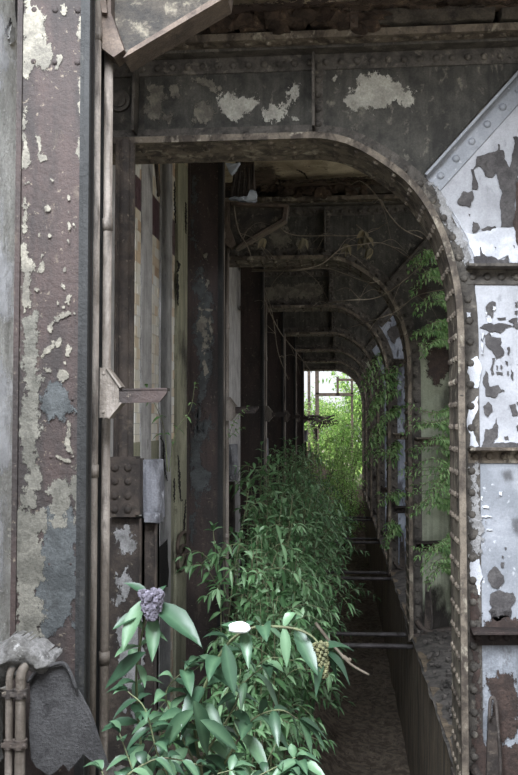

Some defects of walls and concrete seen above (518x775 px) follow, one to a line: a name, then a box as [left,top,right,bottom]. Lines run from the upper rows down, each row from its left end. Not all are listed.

peeling [7,0,63,80]
peeling [189,74,302,126]
peeling [343,70,417,113]
peeling [22,106,47,186]
peeling [457,136,518,234]
peeling [473,245,515,263]
peeling [19,243,77,529]
peeling [467,301,518,447]
peeling [112,524,138,555]
peeling [468,547,516,621]
peeling [111,567,146,727]
rust [484,670,518,747]